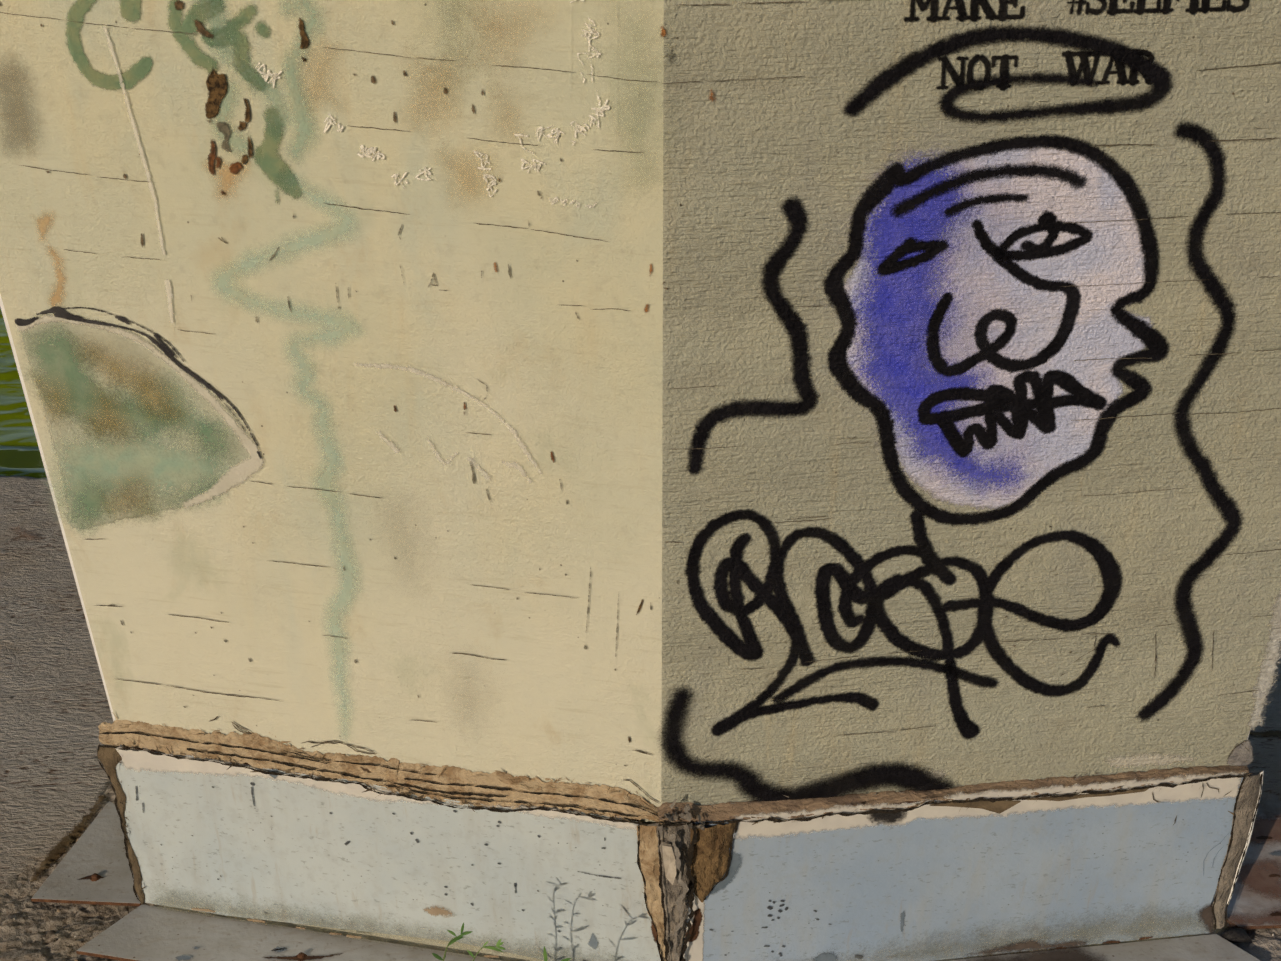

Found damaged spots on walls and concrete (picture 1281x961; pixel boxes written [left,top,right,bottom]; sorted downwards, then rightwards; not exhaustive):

peeling [930,788,1149,814]
peeling [662,843,676,885]